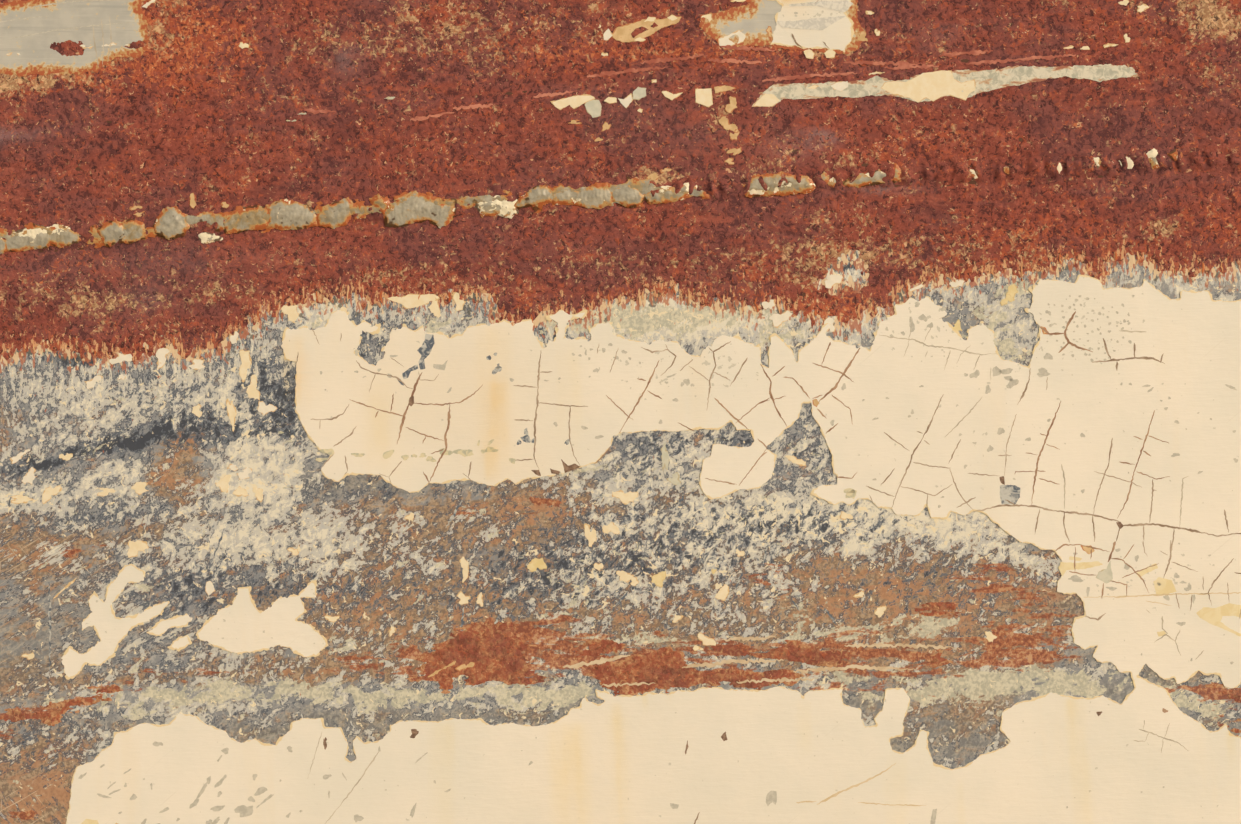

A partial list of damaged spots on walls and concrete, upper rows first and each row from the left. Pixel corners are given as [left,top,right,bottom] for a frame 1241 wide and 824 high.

peeling [0,0,155,77]
peeling [699,0,880,59]
peeling [752,64,1139,107]
rust [0,0,1241,365]
crack [296,329,482,484]
crack [513,311,1241,660]
peeling [0,243,1241,824]
rust [914,602,961,617]
rust [405,622,547,694]
rust [563,635,962,696]